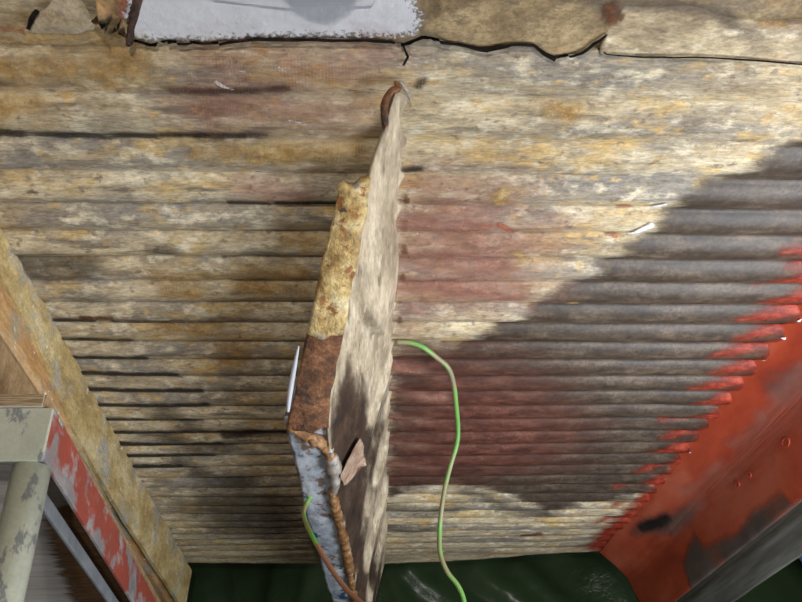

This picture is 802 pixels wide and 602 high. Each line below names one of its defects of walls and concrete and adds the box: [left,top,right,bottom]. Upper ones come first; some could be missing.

crack [118,33,802,66]
spalling [286,346,299,412]
corrosion [328,365,389,602]
damp [386,143,802,547]